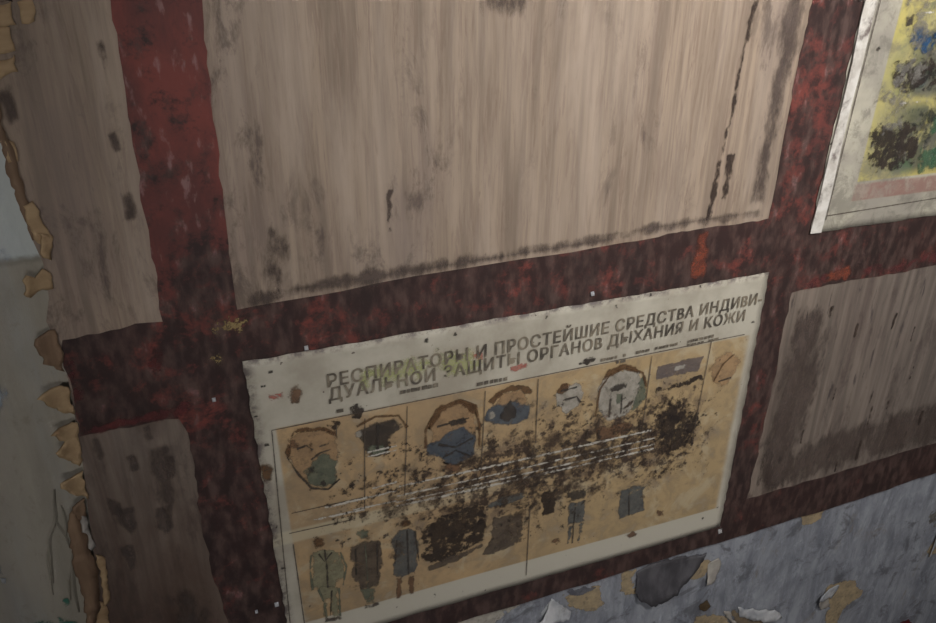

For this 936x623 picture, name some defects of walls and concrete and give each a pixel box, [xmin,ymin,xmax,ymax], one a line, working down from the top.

peeling [620,553,721,607]
peeling [459,605,518,623]
peeling [540,585,604,623]
peeling [694,600,782,623]
peeling [819,580,863,623]